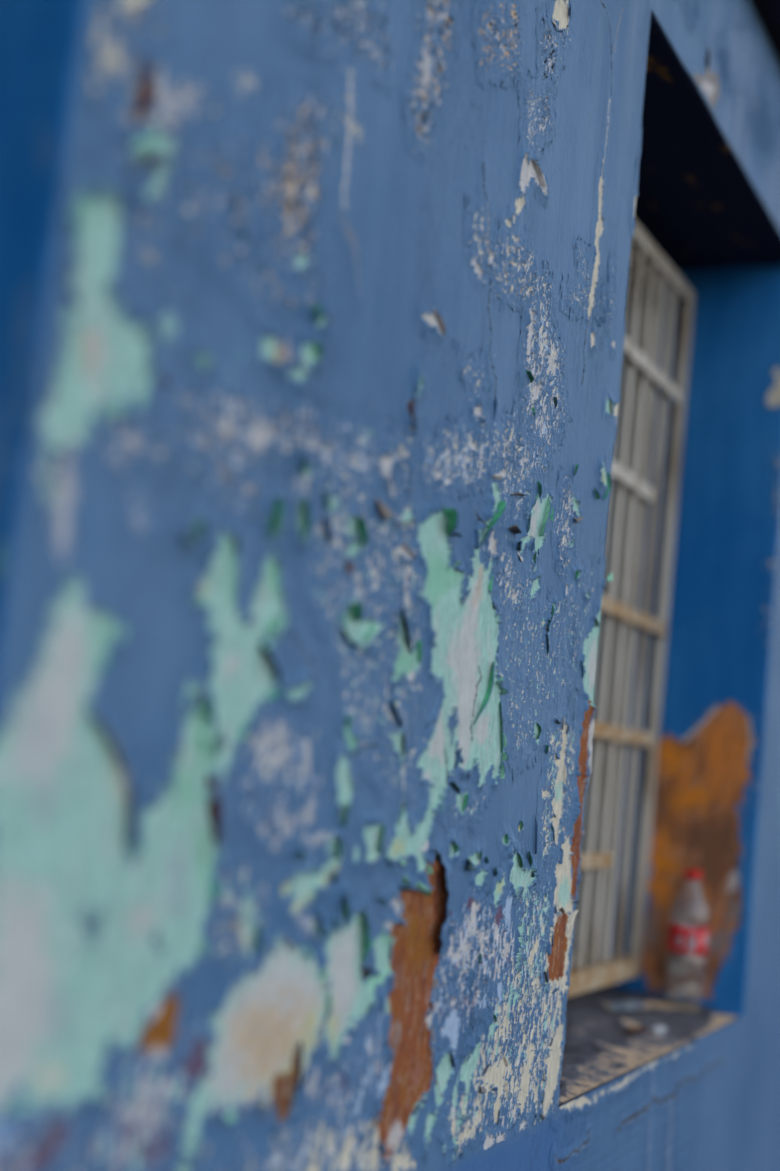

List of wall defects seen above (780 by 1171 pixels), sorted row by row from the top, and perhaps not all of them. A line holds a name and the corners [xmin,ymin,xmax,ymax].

peeling [0,0,337,1171]
peeling [169,0,741,1171]
spalling [636,696,765,1006]
peeling [754,549,776,661]